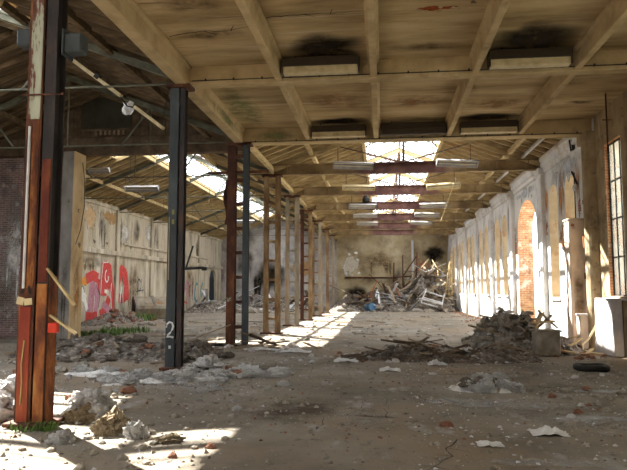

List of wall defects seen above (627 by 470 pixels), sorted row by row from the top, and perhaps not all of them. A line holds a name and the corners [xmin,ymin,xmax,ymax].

flaking render [77,203,123,231]
flaking render [342,252,360,276]